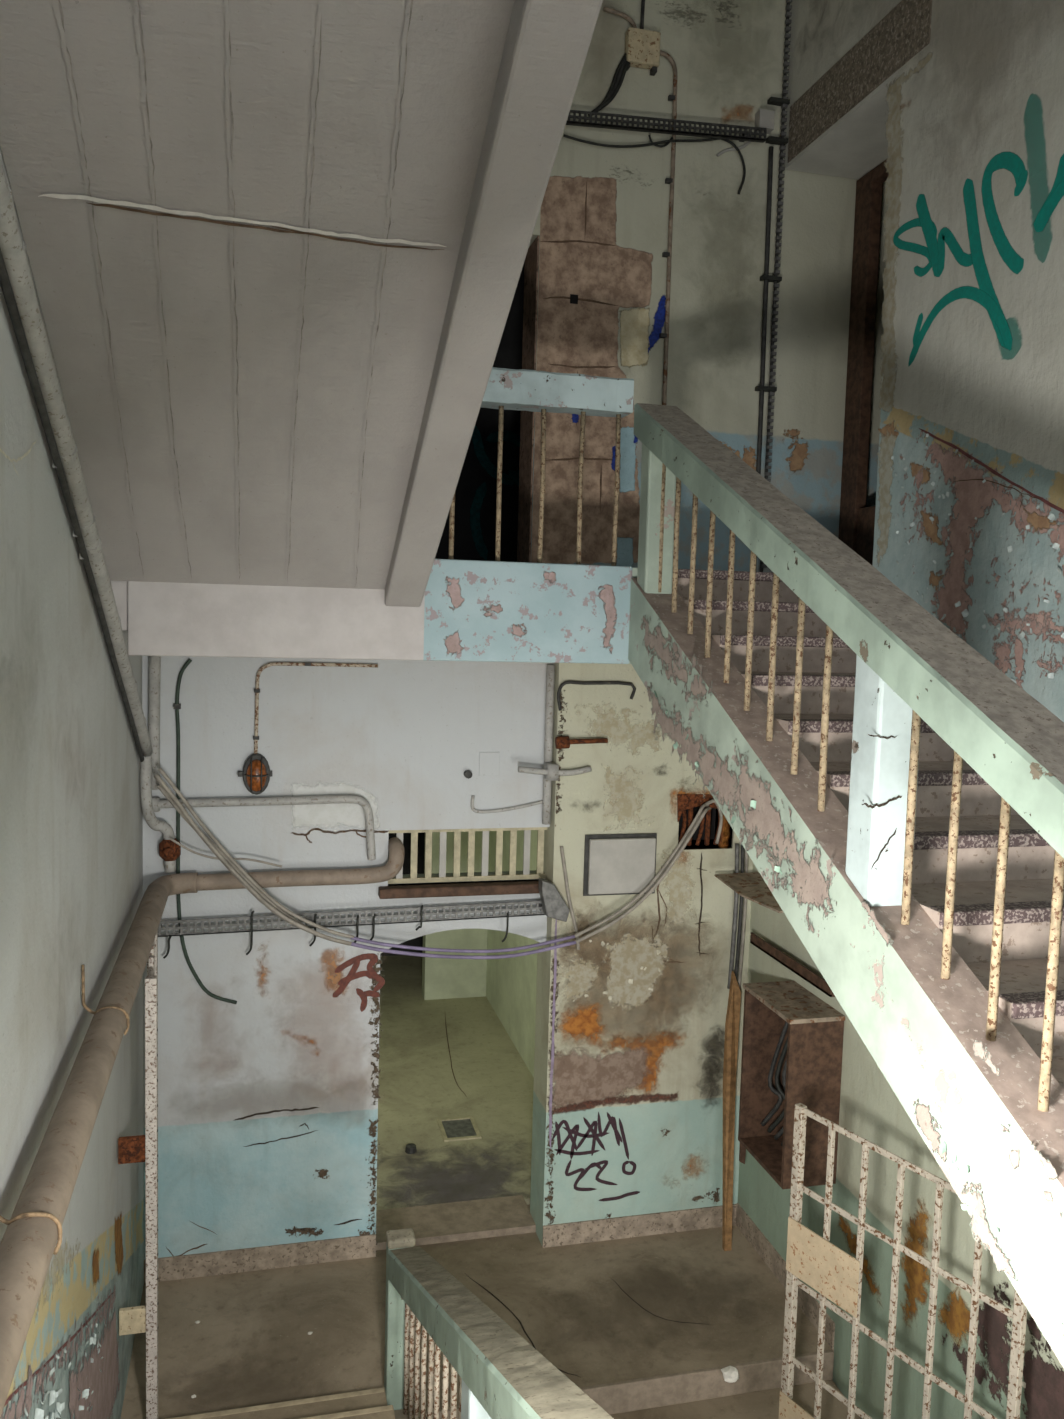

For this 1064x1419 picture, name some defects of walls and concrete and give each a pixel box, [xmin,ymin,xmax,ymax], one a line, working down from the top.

crack [38,194,446,250]
spalling [522,175,654,378]
peeling [877,53,1064,690]
spalling [517,398,640,584]
peeling [597,584,618,654]
peeling [555,613,837,940]
spalling [544,933,668,1225]
corrosion [562,1005,681,1092]
damp [702,1030,724,1100]
peeling [973,1040,1000,1076]
peeling [1,1285,121,1419]
spalling [913,1099,1064,1419]